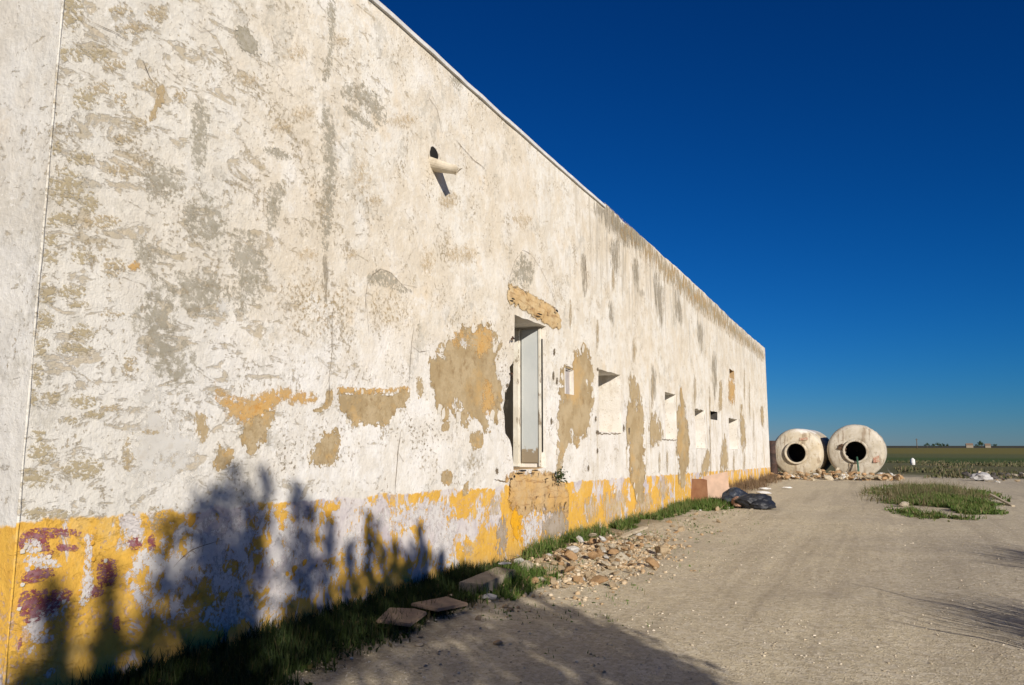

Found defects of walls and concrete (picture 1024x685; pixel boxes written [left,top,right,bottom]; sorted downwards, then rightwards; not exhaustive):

flaking render [507,283,562,329]
flaking render [193,317,509,479]
flaking render [490,342,599,554]
flaking render [584,373,728,523]
peeling [23,506,69,522]
peeling [20,538,62,587]
peeling [62,534,108,606]